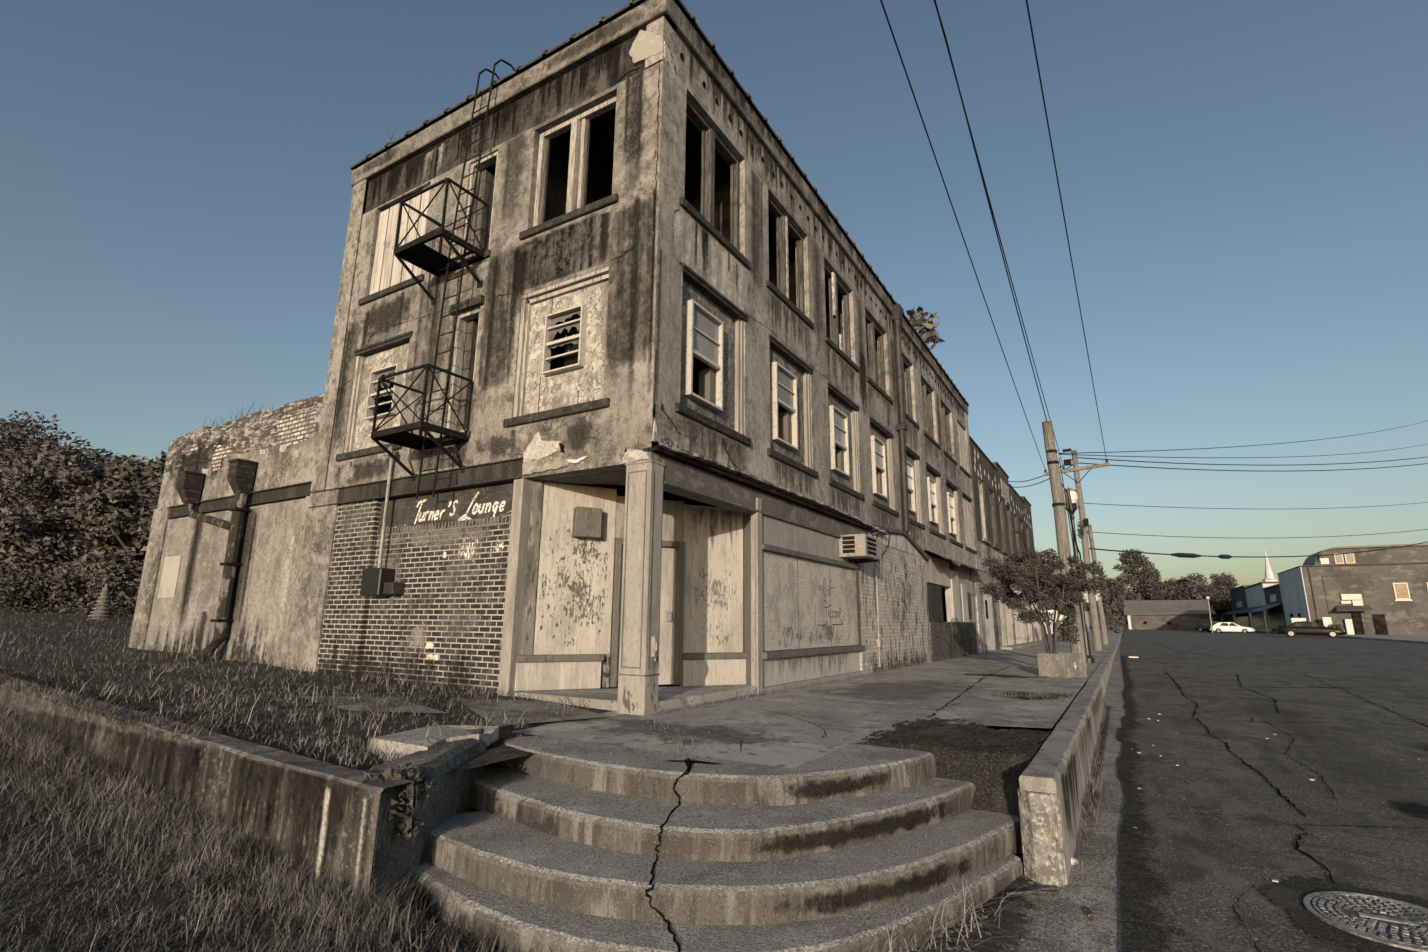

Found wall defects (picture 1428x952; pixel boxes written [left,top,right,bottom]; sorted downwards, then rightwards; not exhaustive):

spalling [629,30,676,80]
leakage [420,190,662,469]
leakage [171,436,223,488]
spalling [522,421,589,476]
leakage [157,510,295,664]
leakage [225,759,366,875]
crack [645,758,720,952]